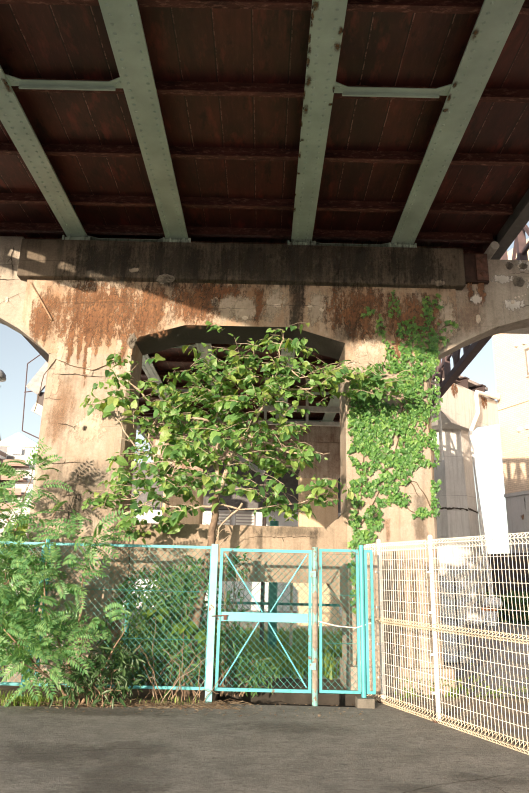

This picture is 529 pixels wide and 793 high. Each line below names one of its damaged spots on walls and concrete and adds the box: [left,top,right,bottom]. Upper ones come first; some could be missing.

damp [54,239,456,328]
peeling [490,260,529,311]
corrosion [29,280,266,385]
corrosion [324,286,442,361]
crack [439,506,478,514]